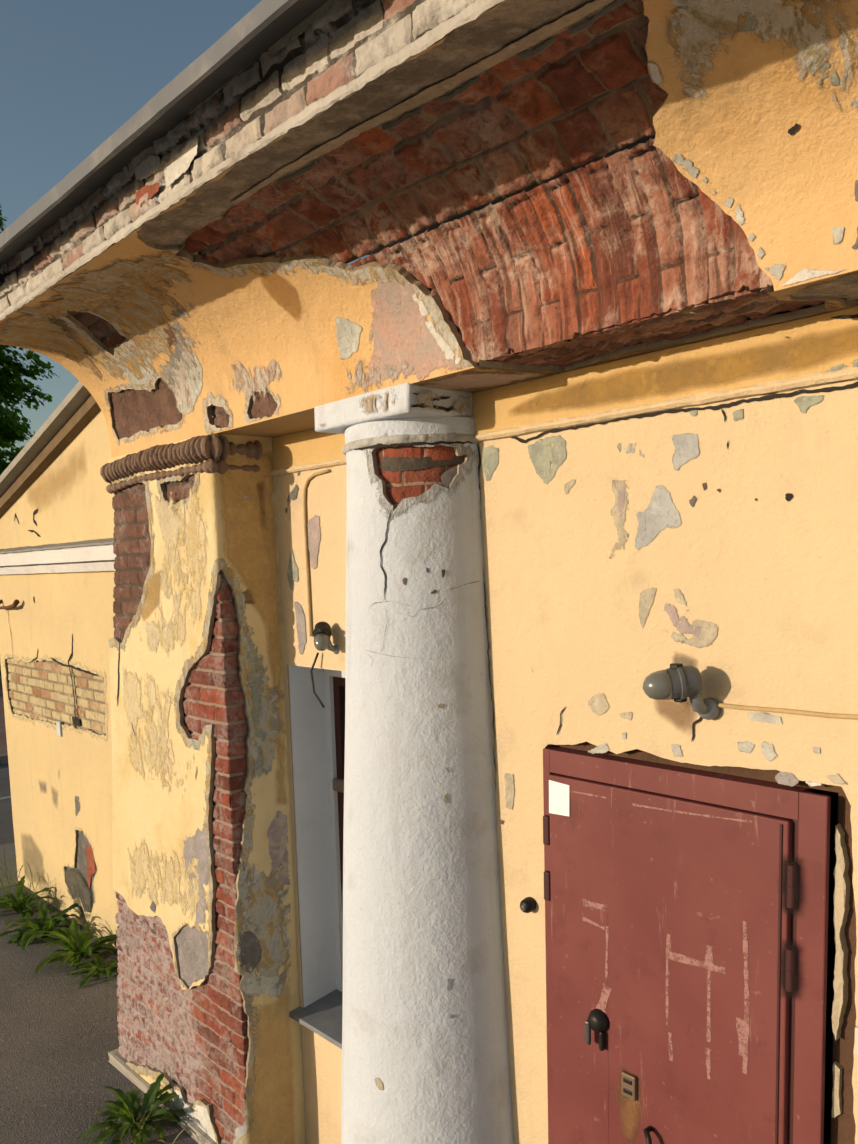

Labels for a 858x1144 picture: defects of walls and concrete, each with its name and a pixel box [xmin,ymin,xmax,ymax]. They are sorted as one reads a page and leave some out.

flaking render [0,0,858,446]
spalling [364,433,499,520]
peeling [528,435,575,494]
peeling [609,480,682,559]
peeling [672,433,700,471]
crack [366,511,496,788]
peeling [639,588,718,648]
flaking render [3,472,293,1144]